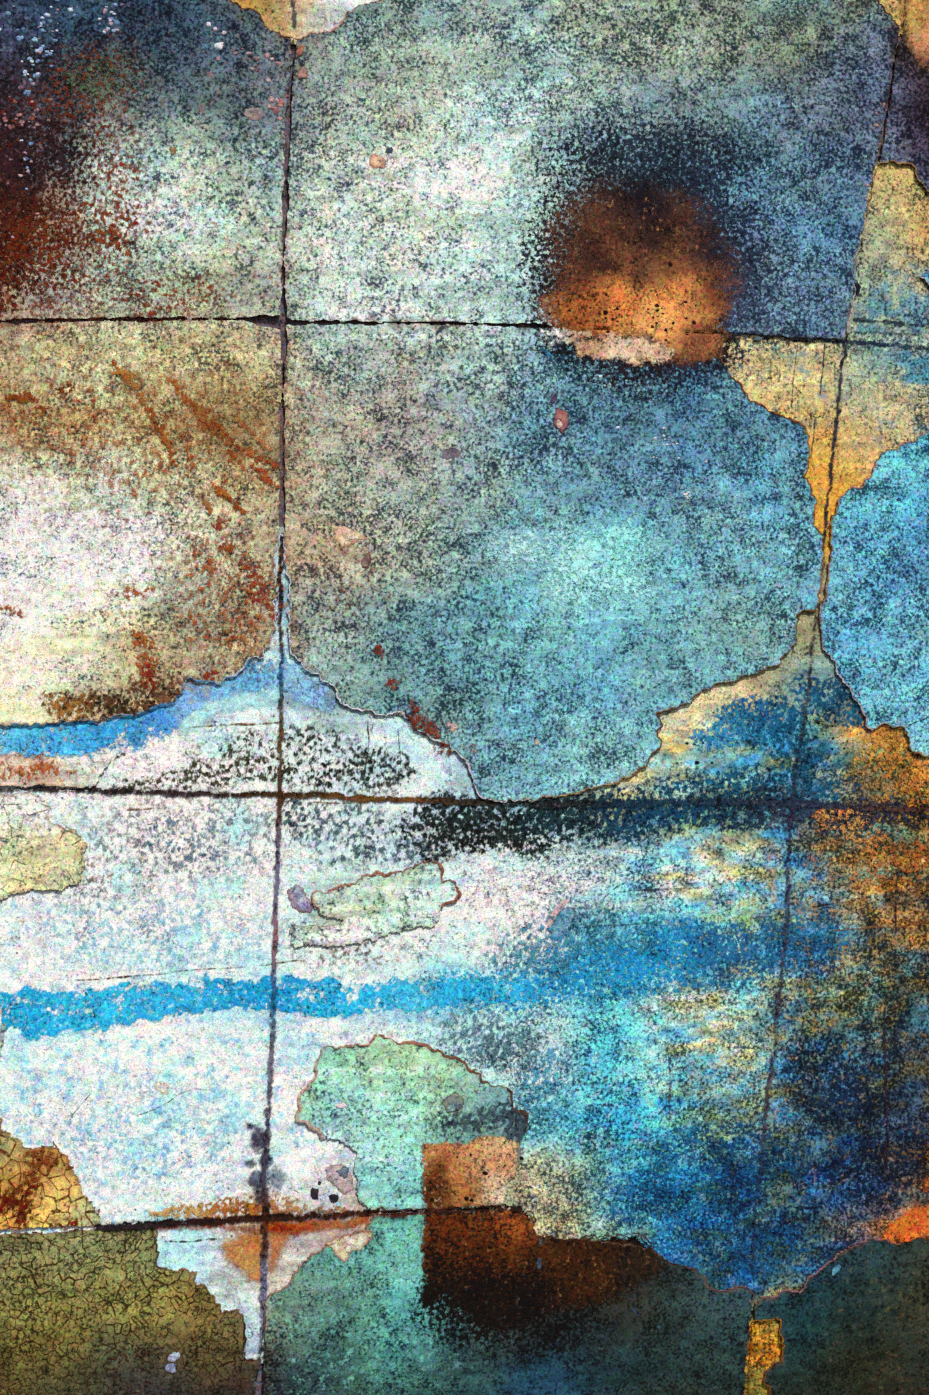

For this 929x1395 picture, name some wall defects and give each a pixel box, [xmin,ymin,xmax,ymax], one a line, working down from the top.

peeling [230,0,380,79]
rust [0,44,229,333]
rust [2,351,305,722]
rust [512,106,837,402]
peeling [537,160,929,821]
crack [791,318,925,456]
crack [0,793,81,893]
crack [75,959,302,980]
peeling [0,526,929,1364]
crack [0,1093,247,1395]
rust [408,1135,669,1365]
peeling [744,1314,785,1395]